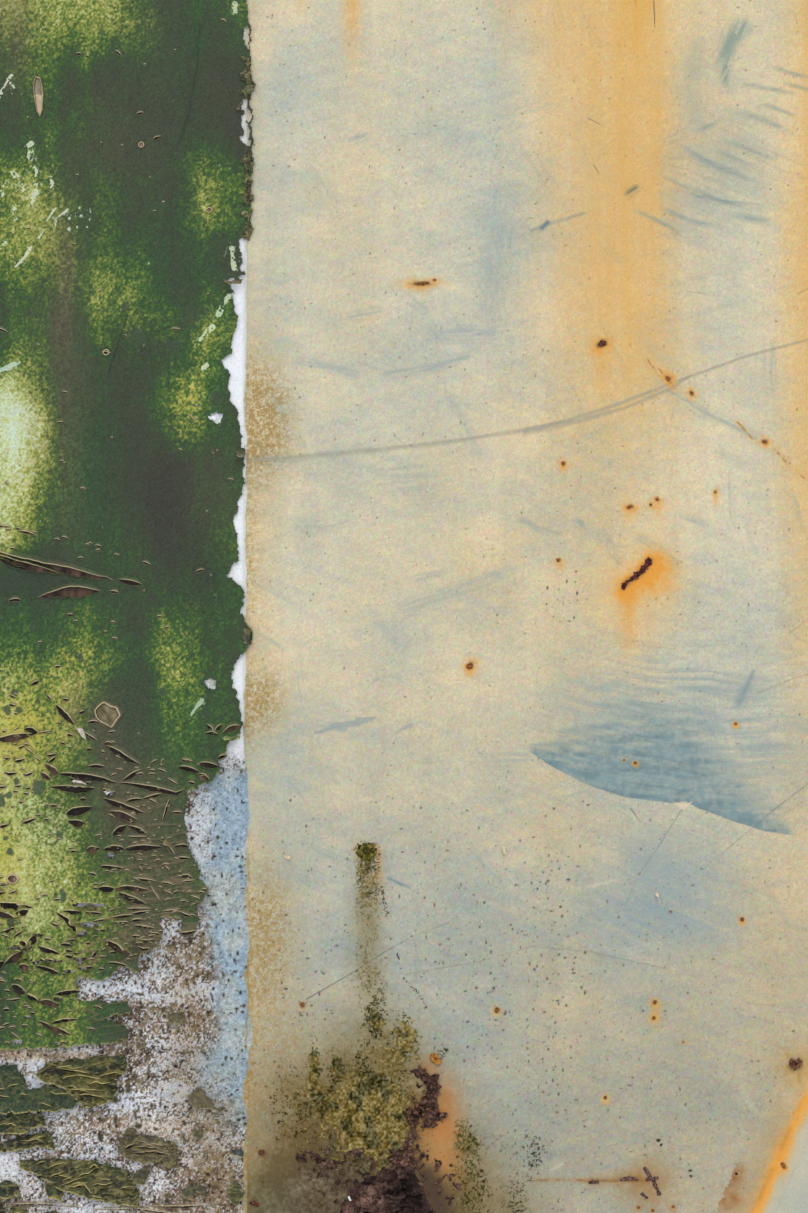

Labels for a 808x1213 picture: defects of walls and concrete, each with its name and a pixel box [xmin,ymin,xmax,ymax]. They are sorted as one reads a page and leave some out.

rust [337,0,366,79]
peeling [237,99,247,145]
rust [389,275,454,296]
rust [732,0,808,718]
peeling [0,238,251,1213]
rust [458,651,483,682]
water stain [247,849,577,1213]
rust [646,995,664,1033]
rust [340,1053,448,1213]
rust [716,1012,808,1213]